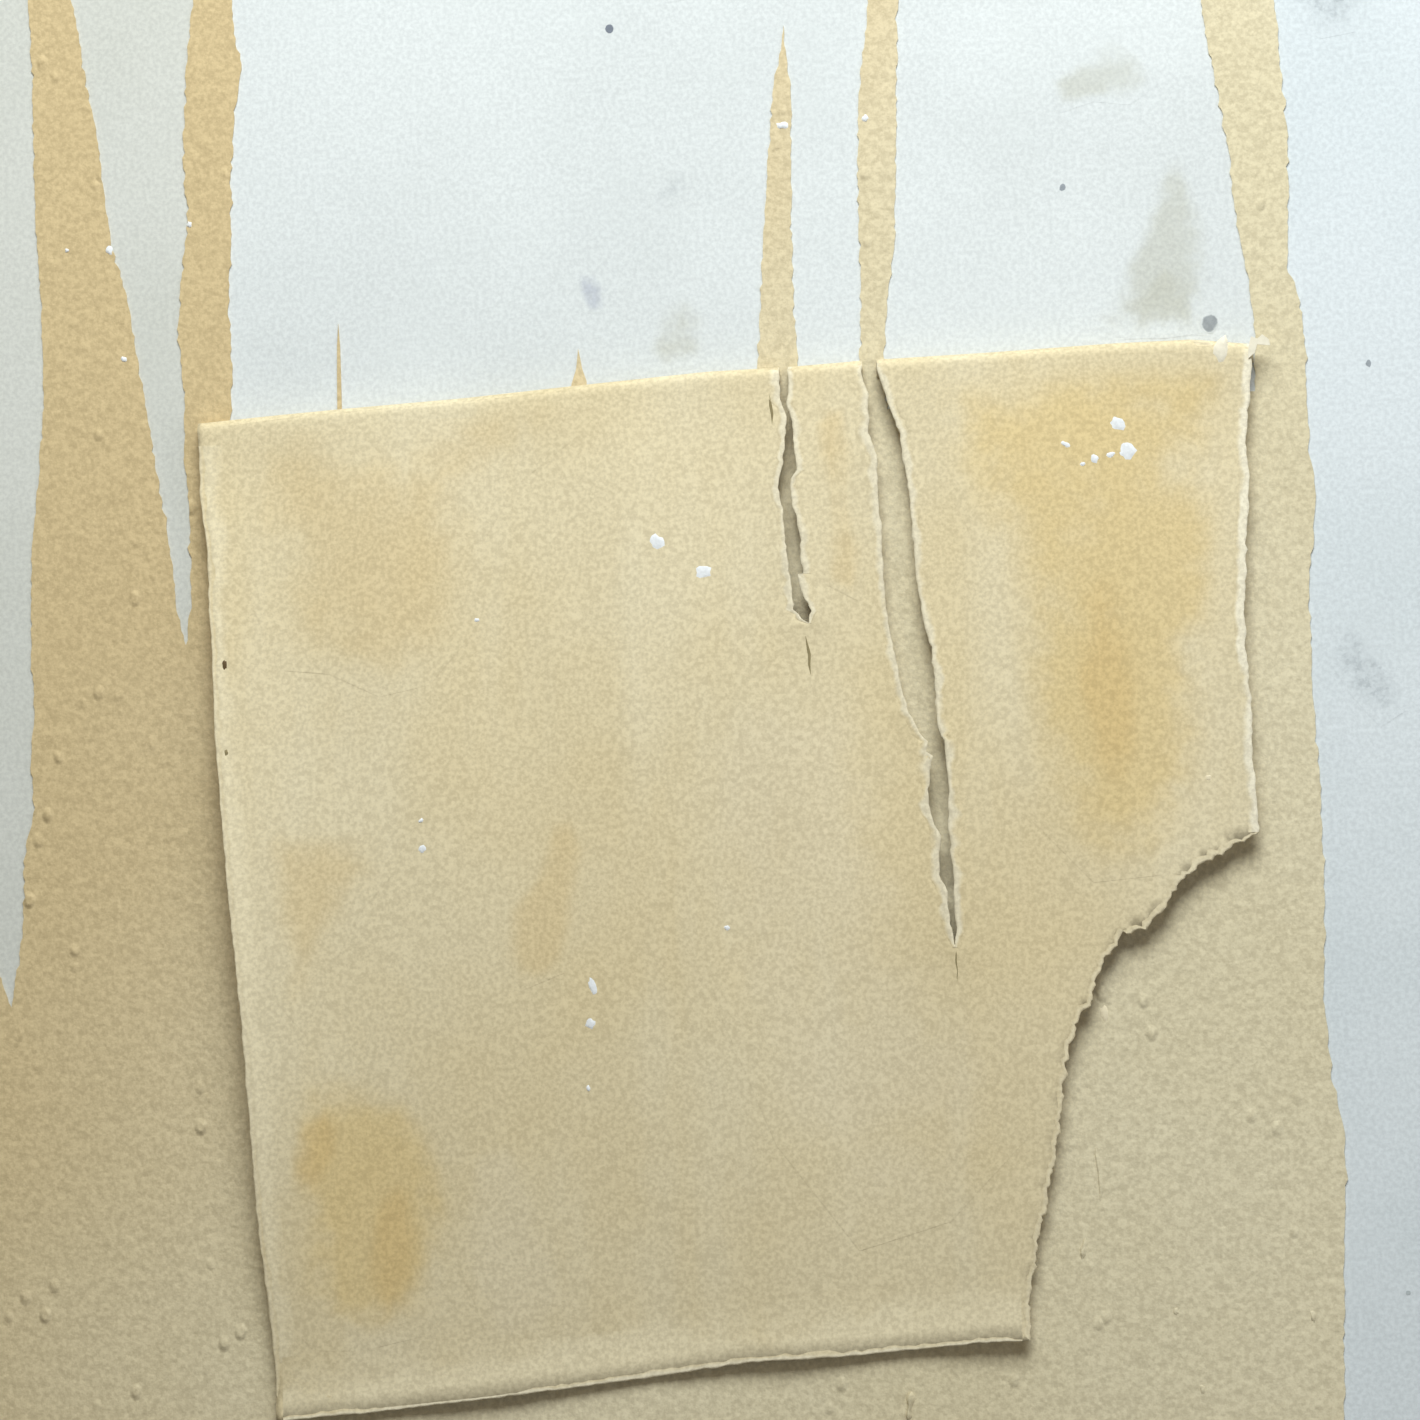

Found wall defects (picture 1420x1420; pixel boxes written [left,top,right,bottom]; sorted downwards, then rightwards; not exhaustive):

peeling [71,0,193,644]
peeling [197,0,1270,1420]